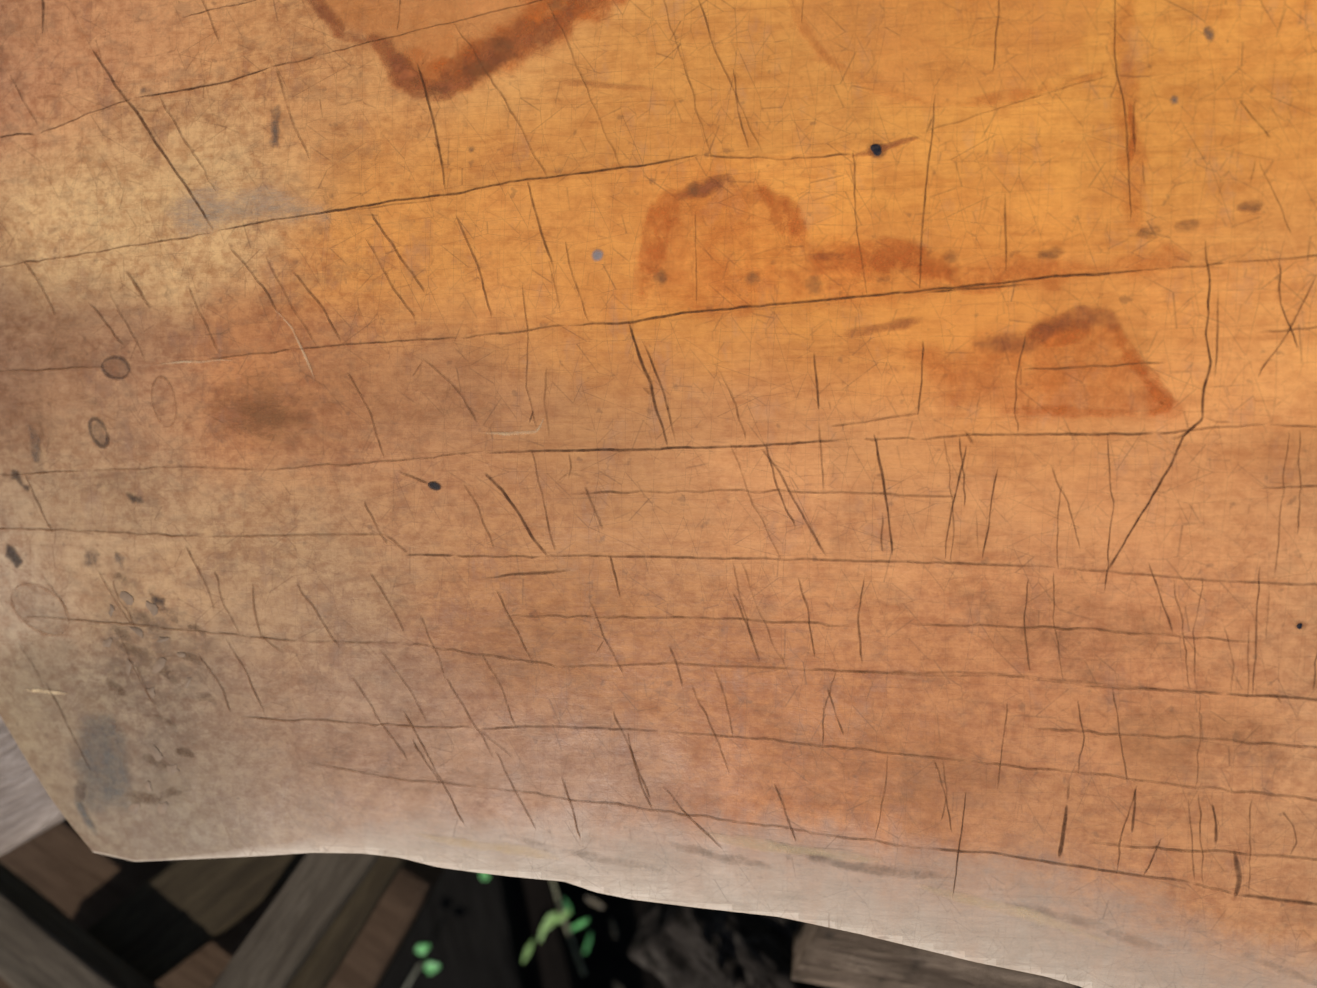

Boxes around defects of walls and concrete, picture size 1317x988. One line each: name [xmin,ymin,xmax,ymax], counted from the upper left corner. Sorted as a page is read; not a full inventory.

damp [369,0,622,99]
crack [0,53,1136,759]
damp [687,179,721,197]
crack [1014,249,1221,584]
crack [1269,426,1317,527]
crack [1278,255,1315,345]
crack [60,581,795,847]
crack [918,656,1317,906]